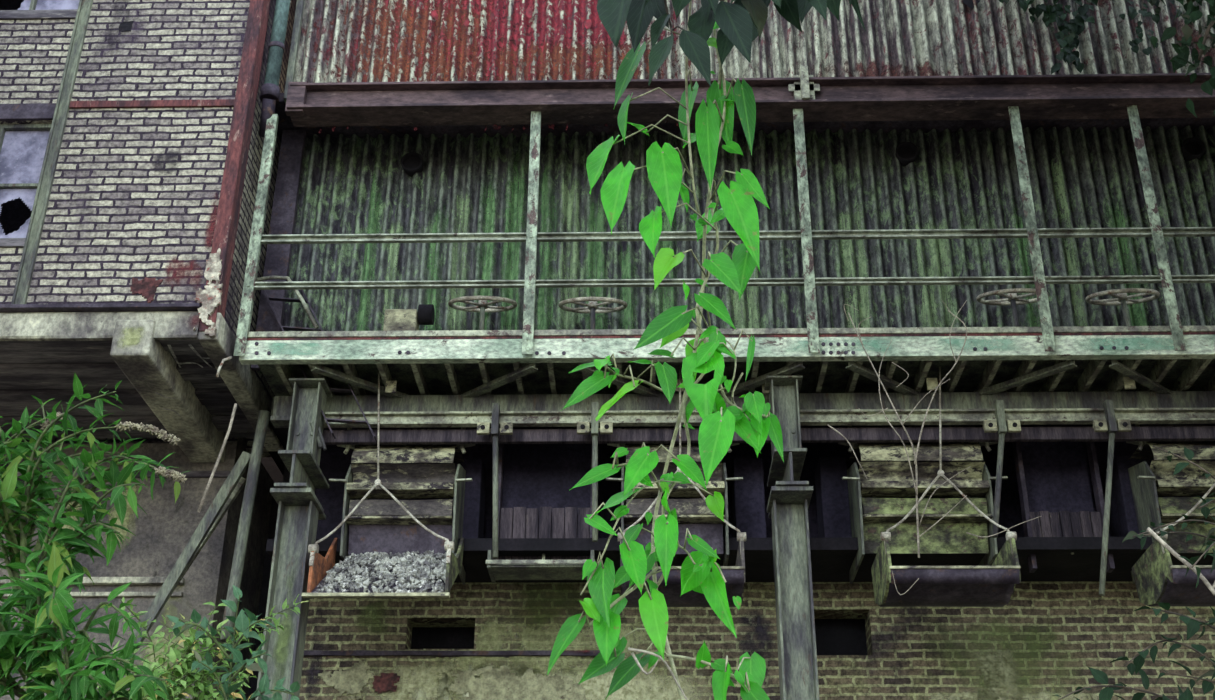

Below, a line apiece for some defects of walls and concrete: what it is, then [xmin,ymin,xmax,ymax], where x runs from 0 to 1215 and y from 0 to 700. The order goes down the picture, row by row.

rust [297,0,691,82]
rust [787,60,941,77]
rust [205,193,218,247]
rust [167,258,201,288]
spalling [193,248,223,338]
peeling [318,660,400,700]